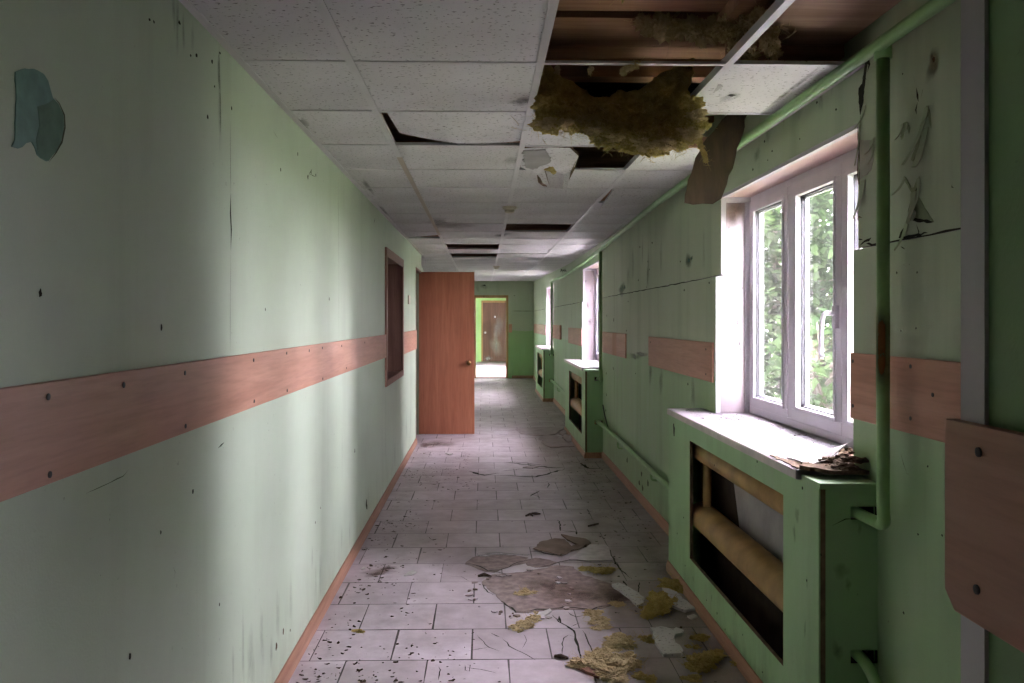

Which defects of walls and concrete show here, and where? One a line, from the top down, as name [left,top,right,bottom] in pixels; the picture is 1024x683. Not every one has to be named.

peeling [36,99,64,161]
peeling [848,105,874,220]
peeling [891,106,934,223]
crack [469,462,603,498]
crack [438,511,640,680]
spalling [465,554,630,619]